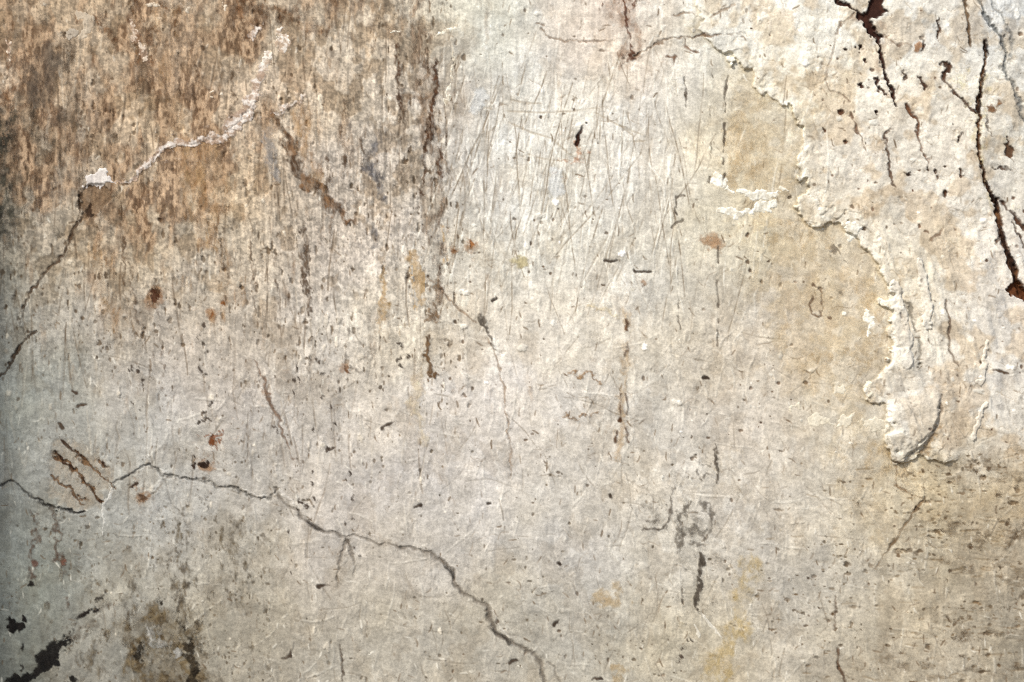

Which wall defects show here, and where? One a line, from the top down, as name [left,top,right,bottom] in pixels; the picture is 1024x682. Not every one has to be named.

water stain [0,17,85,235]
crack [22,193,81,308]
water stain [94,0,235,262]
crack [115,67,306,186]
water stain [260,111,354,225]
water stain [412,2,447,195]
flaking render [708,171,789,220]
crack [835,0,928,187]
crack [939,0,1024,301]
water stain [423,334,439,381]
flaking render [789,402,885,432]
flaking render [862,308,876,338]